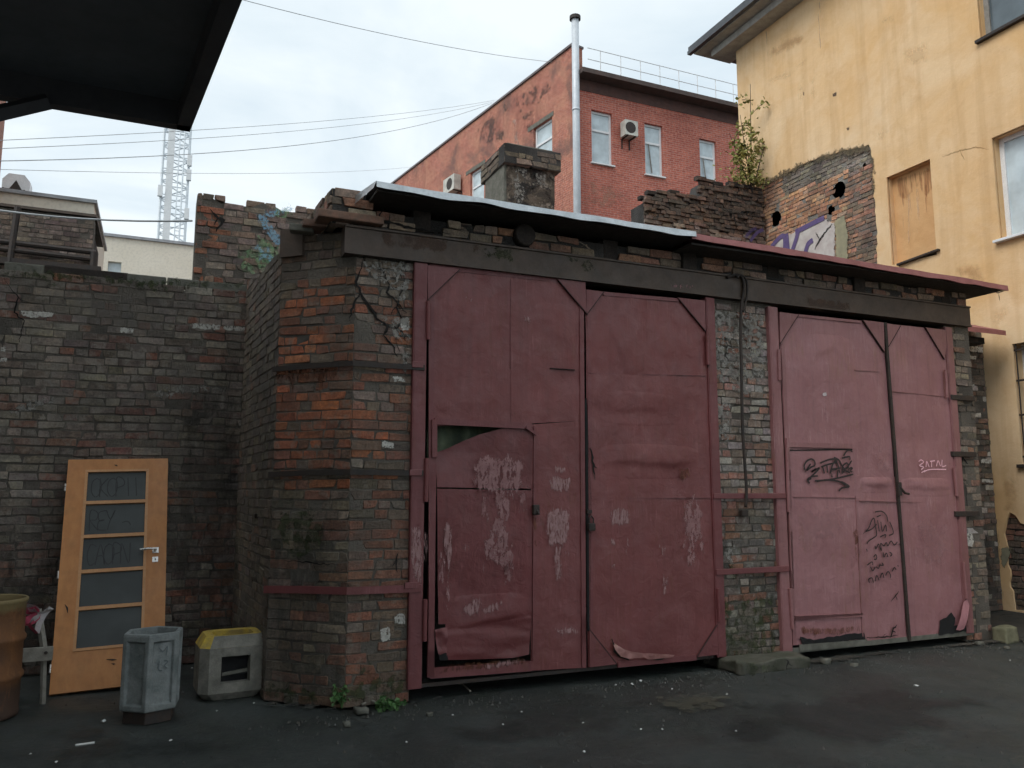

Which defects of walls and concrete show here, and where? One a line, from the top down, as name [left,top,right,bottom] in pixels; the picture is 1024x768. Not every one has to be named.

crack [349,257,407,356]
peeling [411,527,428,583]
peeling [472,454,528,585]
peeling [546,508,569,579]
peeling [682,494,703,566]
flaking render [1005,513,1024,610]